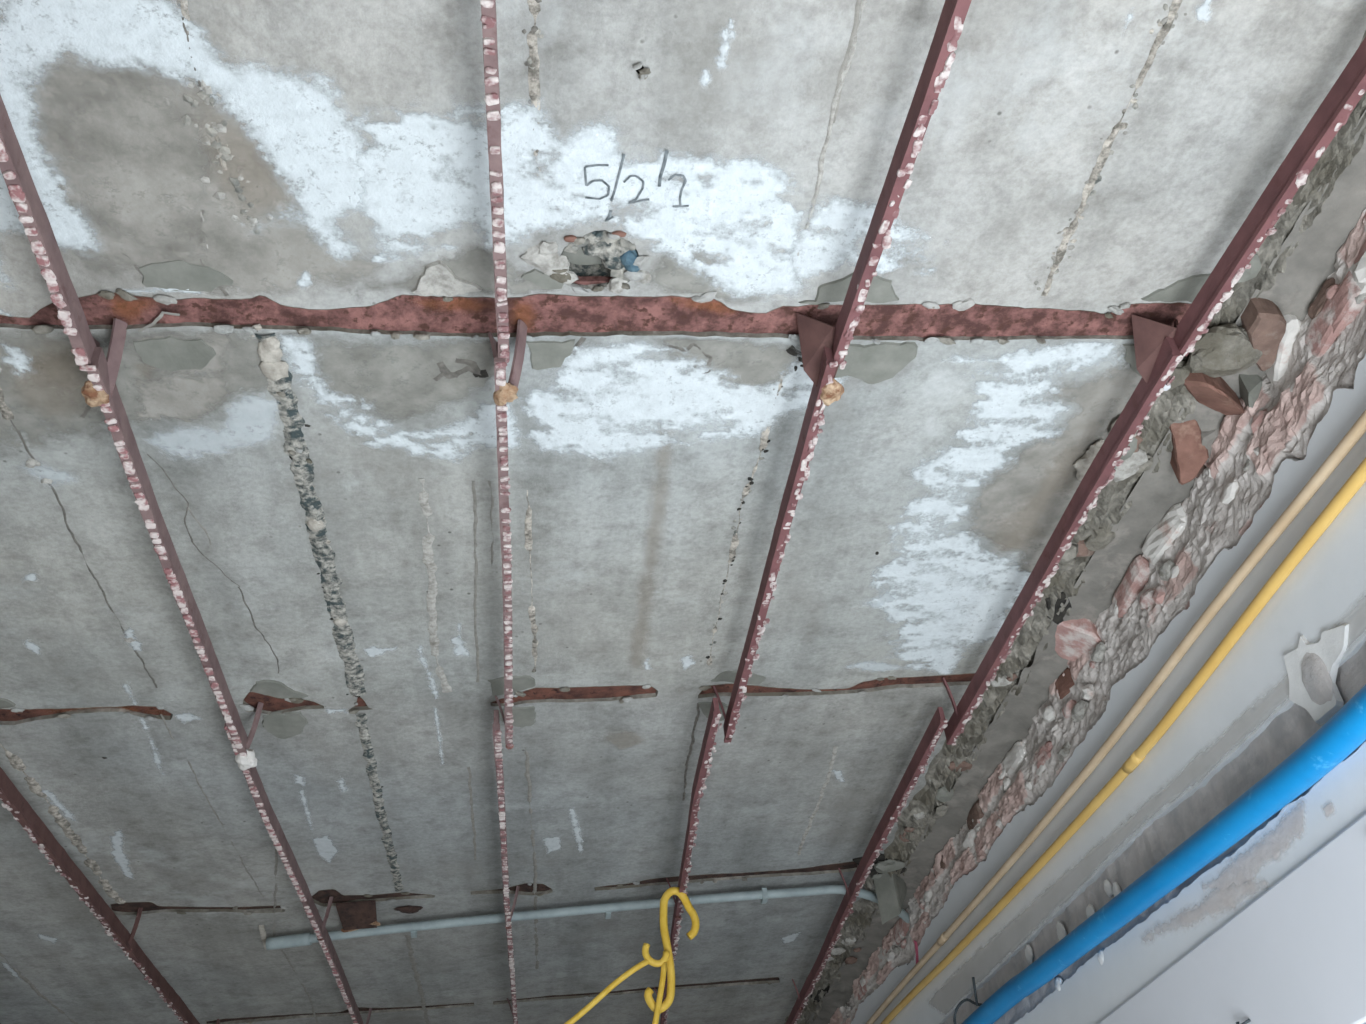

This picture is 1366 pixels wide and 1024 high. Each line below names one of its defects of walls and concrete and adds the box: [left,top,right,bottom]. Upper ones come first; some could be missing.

spalling [0,303,64,334]
crack [0,368,279,897]
damp [0,0,876,301]
spalling [78,230,830,397]
damp [281,333,813,462]
efflorescence [876,220,929,274]
flaking render [594,209,1366,1024]
damp [855,342,1142,674]
spalling [1207,92,1366,329]